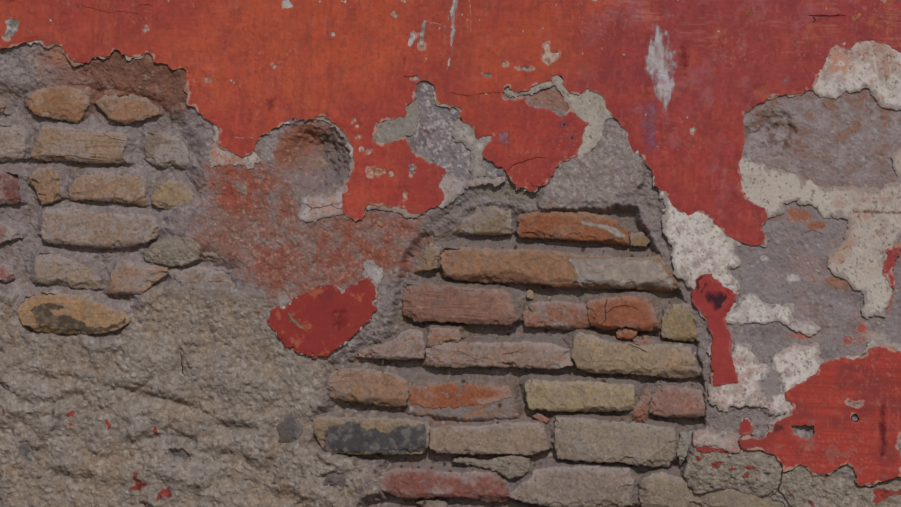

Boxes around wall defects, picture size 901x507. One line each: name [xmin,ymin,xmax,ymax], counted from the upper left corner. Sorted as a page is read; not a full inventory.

peeling [3,19,19,39]
peeling [408,20,427,48]
spalling [0,43,446,359]
spalling [310,40,901,507]